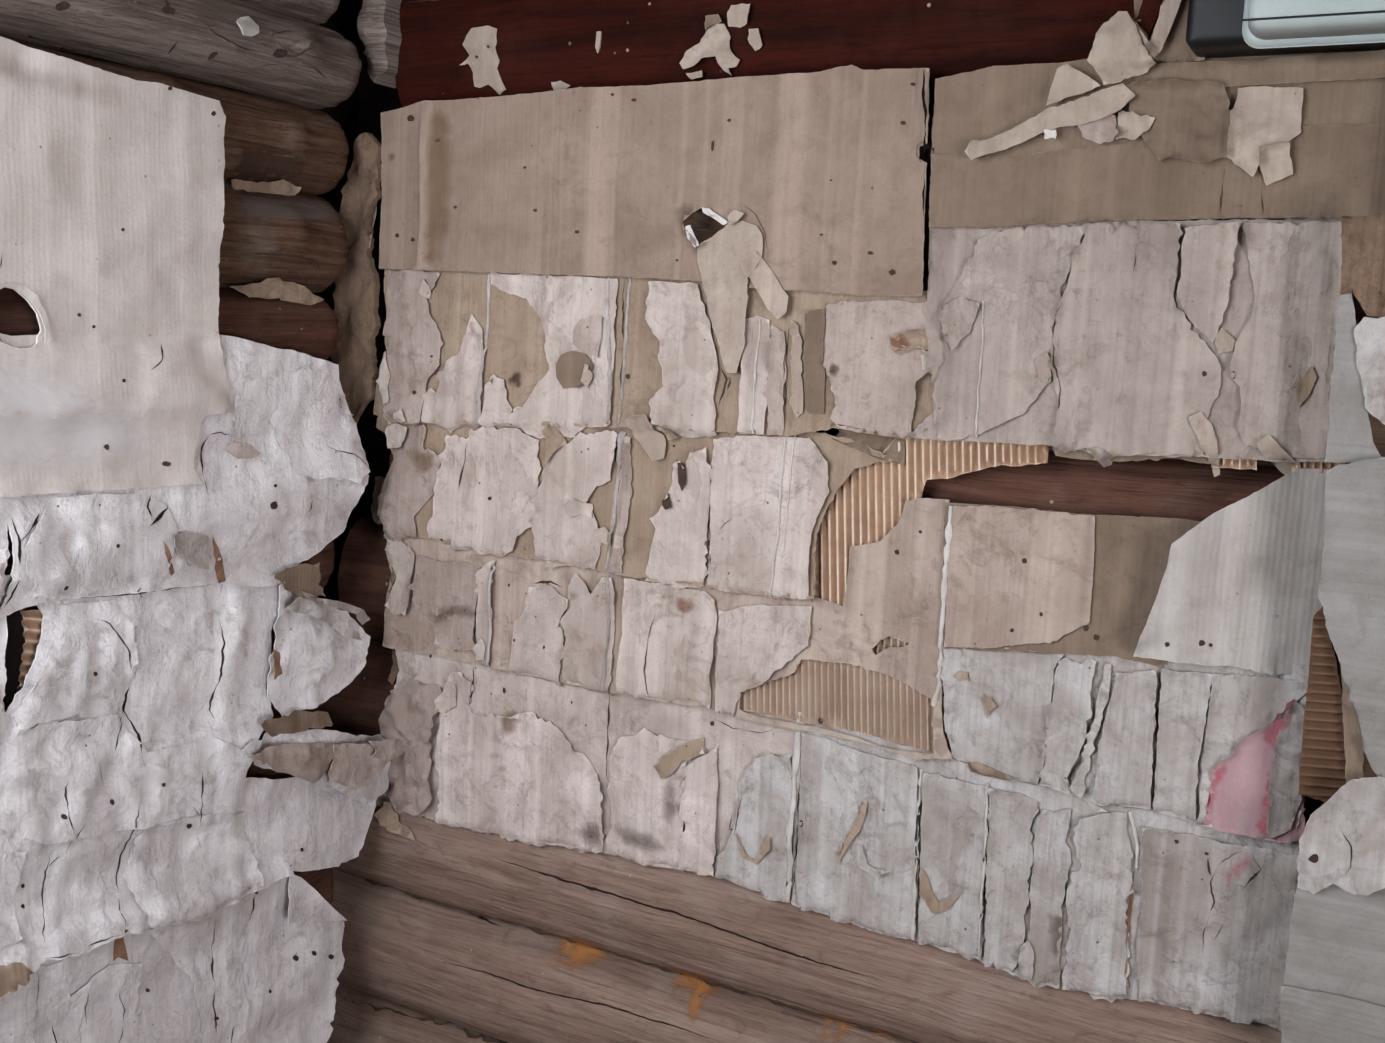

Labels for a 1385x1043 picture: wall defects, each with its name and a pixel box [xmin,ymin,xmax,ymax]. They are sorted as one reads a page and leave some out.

crack [1052,304,1062,409]
crack [5,514,39,606]
crack [63,581,225,782]
crack [193,774,204,843]
crack [41,783,140,959]
crack [85,994,125,1042]
crack [211,928,234,1043]
crack [436,960,720,1042]
rust [562,939,606,963]
crack [491,856,884,982]
crack [1124,867,1135,989]